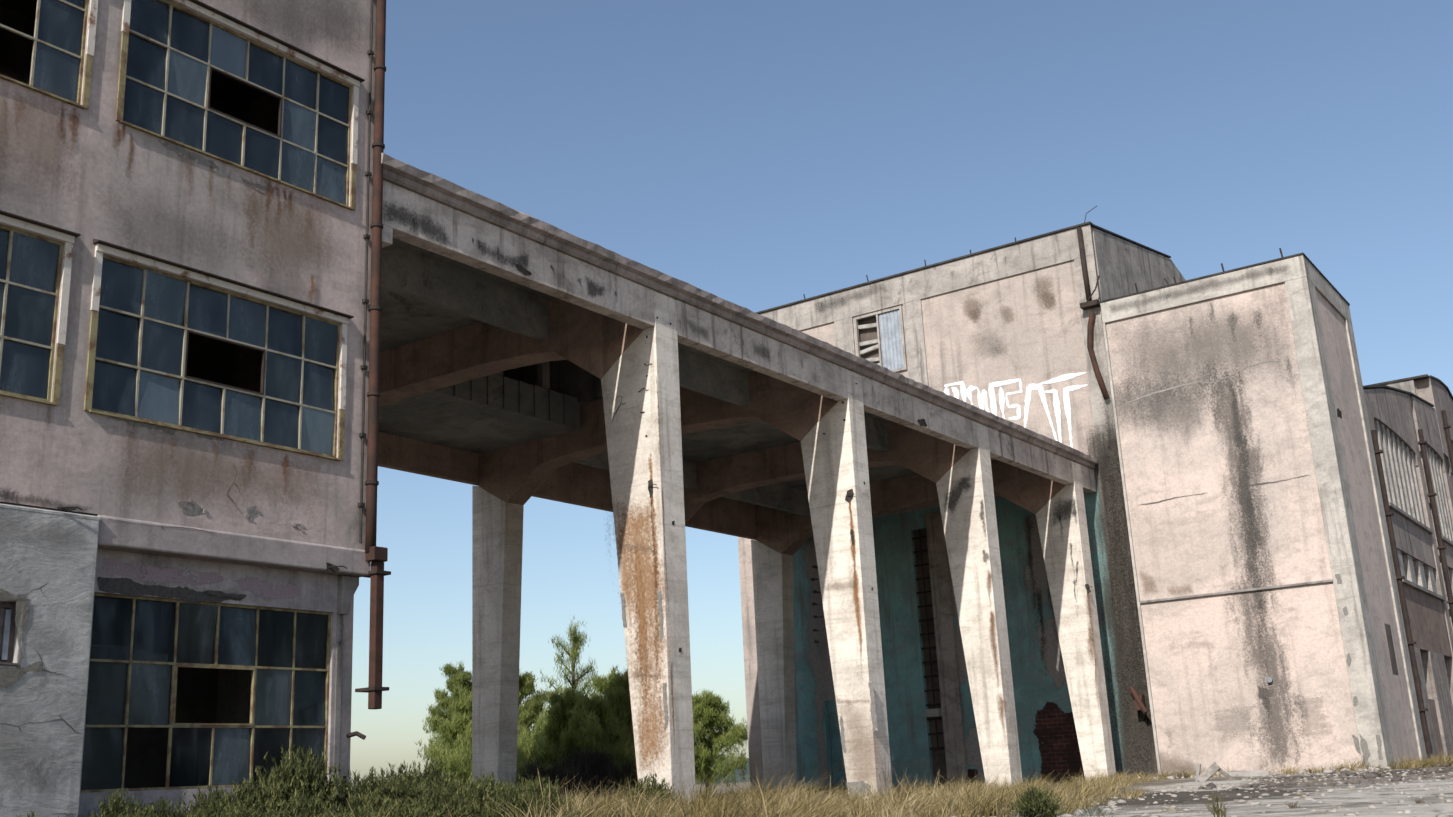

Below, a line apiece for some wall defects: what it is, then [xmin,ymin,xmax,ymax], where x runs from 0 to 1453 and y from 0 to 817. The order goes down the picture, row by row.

flaking render [0,589,43,688]
crack [0,716,82,734]
flaking render [179,500,207,516]
rust [616,380,674,766]
flaking render [801,537,871,797]
rust [849,502,862,645]
flaking render [868,681,878,732]
flaking render [950,571,968,685]
flaking render [1023,515,1084,783]
leakage [1053,500,1078,596]
leakage [1087,425,1158,778]
leakage [1130,317,1300,763]